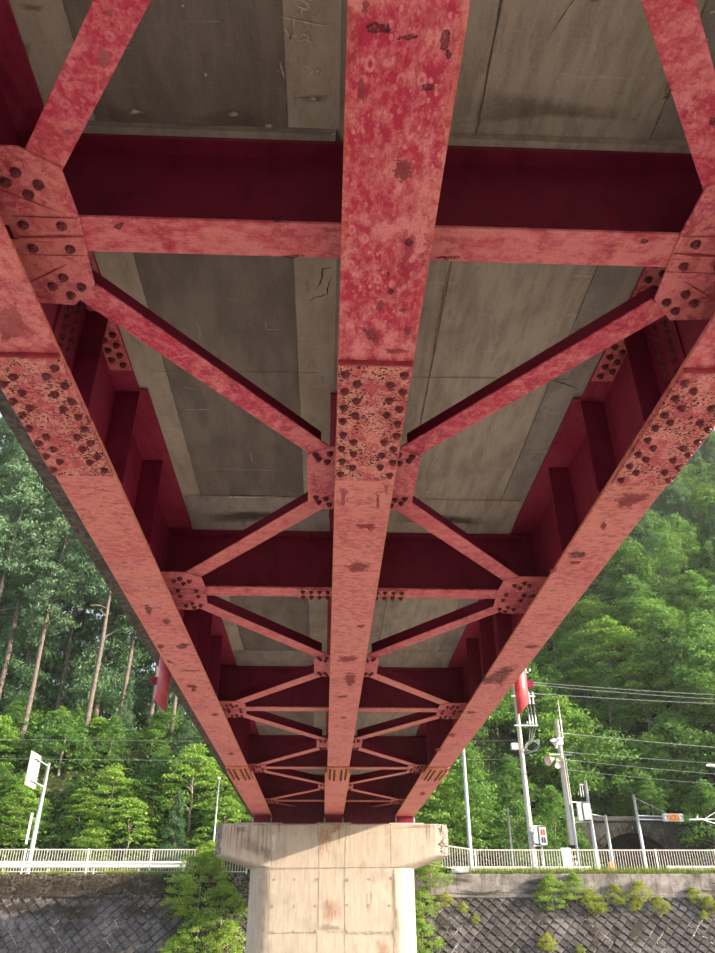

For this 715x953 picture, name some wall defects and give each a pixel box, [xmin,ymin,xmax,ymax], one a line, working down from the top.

crack [479,0,503,126]
peeling [393,156,413,183]
crack [309,267,331,303]